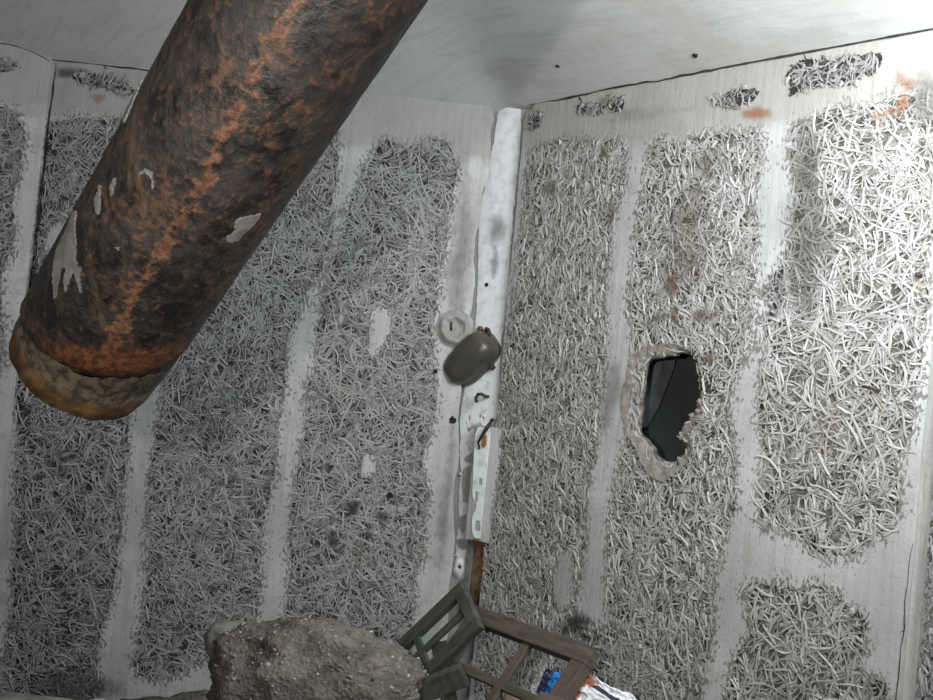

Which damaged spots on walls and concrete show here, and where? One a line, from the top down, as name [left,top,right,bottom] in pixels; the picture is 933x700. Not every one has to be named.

flaking render [708,83,760,110]
flaking render [785,49,882,97]
spalling [621,343,703,482]